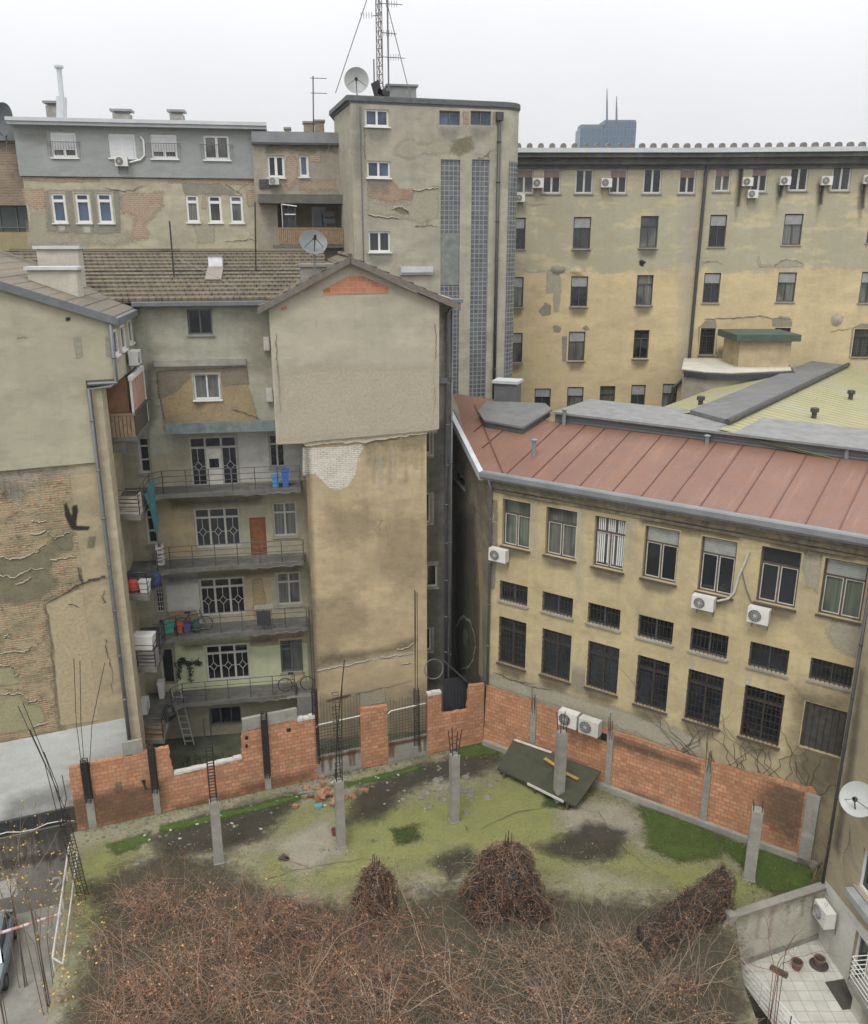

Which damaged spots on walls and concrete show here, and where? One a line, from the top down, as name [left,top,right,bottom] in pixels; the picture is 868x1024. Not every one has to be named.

peeling [23,177,164,247]
peeling [367,180,439,223]
peeling [539,269,561,332]
spalling [303,432,427,491]
peeling [0,466,105,828]